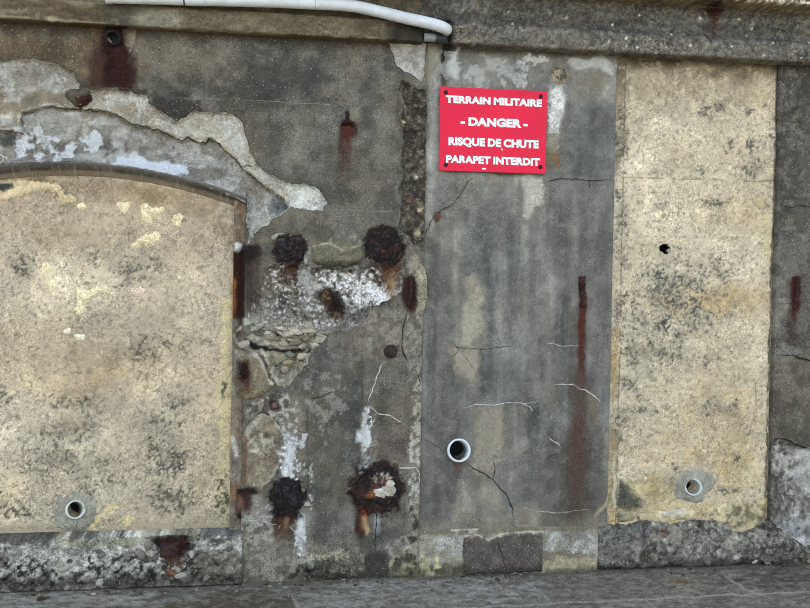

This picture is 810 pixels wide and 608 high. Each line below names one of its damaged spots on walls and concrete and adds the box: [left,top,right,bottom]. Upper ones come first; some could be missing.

spalling [0,57,327,249]
corrosion [232,233,309,321]
spalling [233,264,405,388]
corrosion [319,287,346,318]
crack [367,361,403,423]
corrosion [362,224,418,312]
crack [401,318,421,384]
spalling [413,263,428,315]
crack [466,401,538,411]
corrosion [565,276,590,519]
crack [468,462,589,528]
spalling [616,375,810,546]